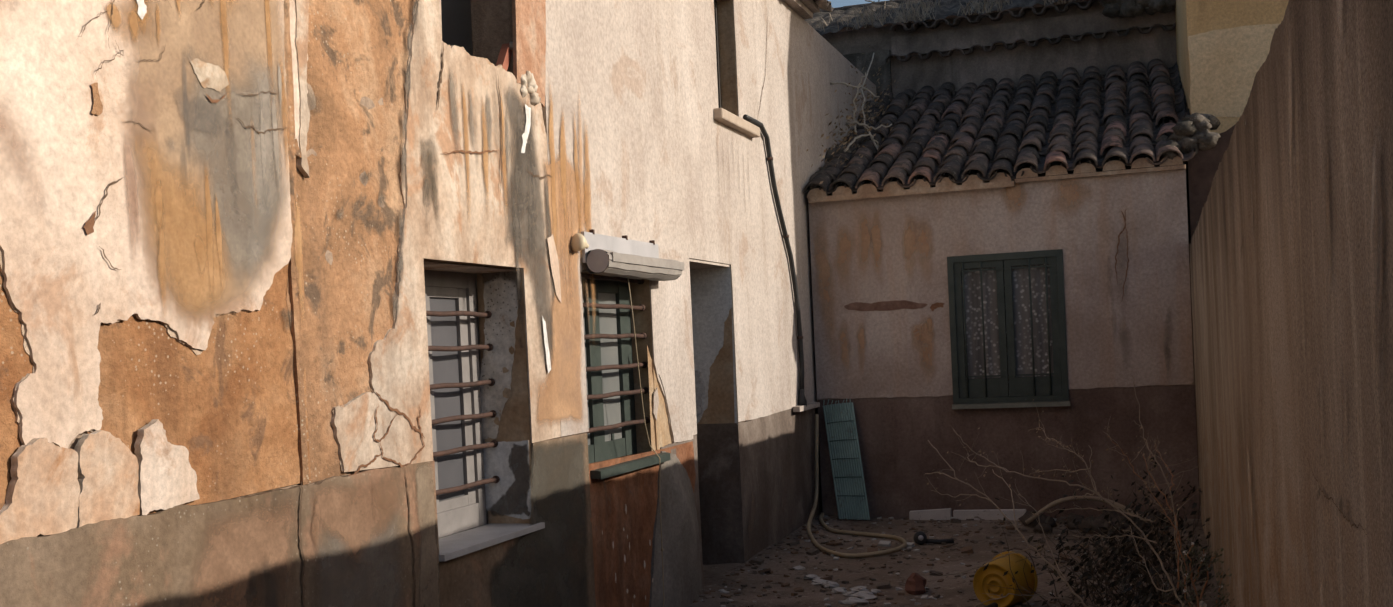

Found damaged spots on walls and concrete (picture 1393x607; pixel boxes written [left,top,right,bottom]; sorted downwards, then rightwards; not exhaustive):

crack [94,177,124,270]
water stain [107,0,288,315]
flaking render [0,0,415,607]
water stain [294,206,303,300]
crack [348,392,425,607]
peeling [480,268,532,519]
water stain [450,75,592,357]
flaking render [547,234,561,302]